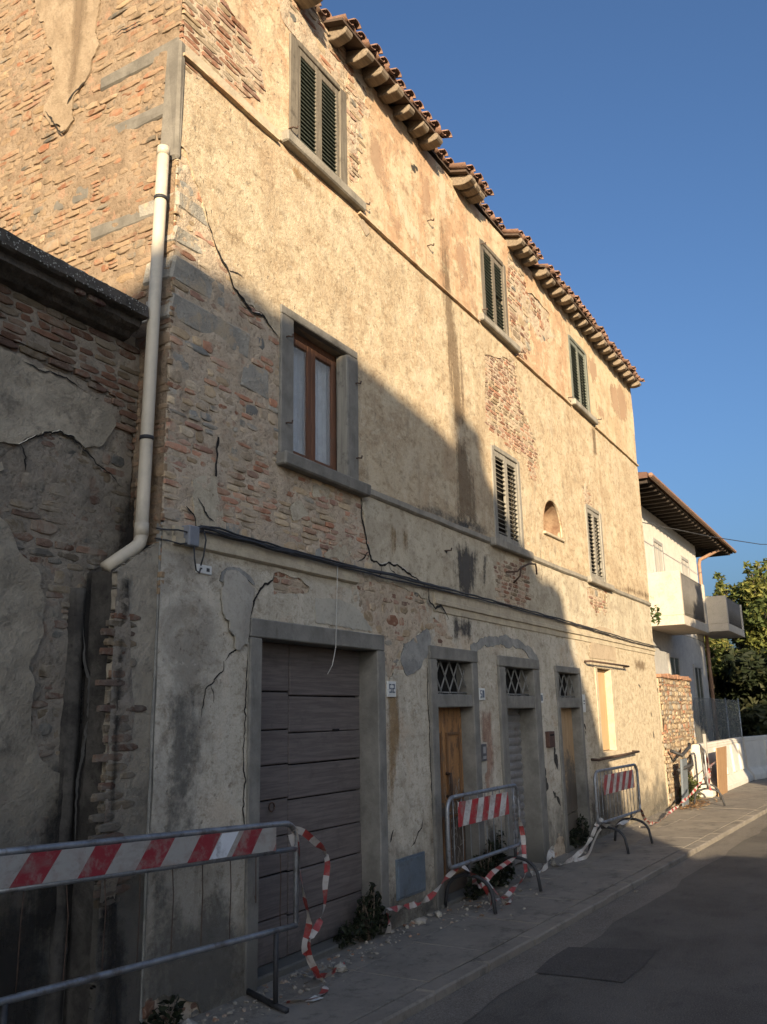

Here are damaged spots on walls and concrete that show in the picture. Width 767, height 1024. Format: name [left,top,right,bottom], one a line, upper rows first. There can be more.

crack [205,207,279,338]
flaking render [159,147,454,687]
water stain [442,252,464,425]
flaking render [485,250,554,481]
flaking render [0,283,140,772]
crack [250,573,275,617]
crack [359,498,449,619]
water stain [456,442,476,528]
water stain [455,545,487,596]
flaking render [493,558,532,611]
water stain [168,701,198,828]
crack [201,649,248,824]